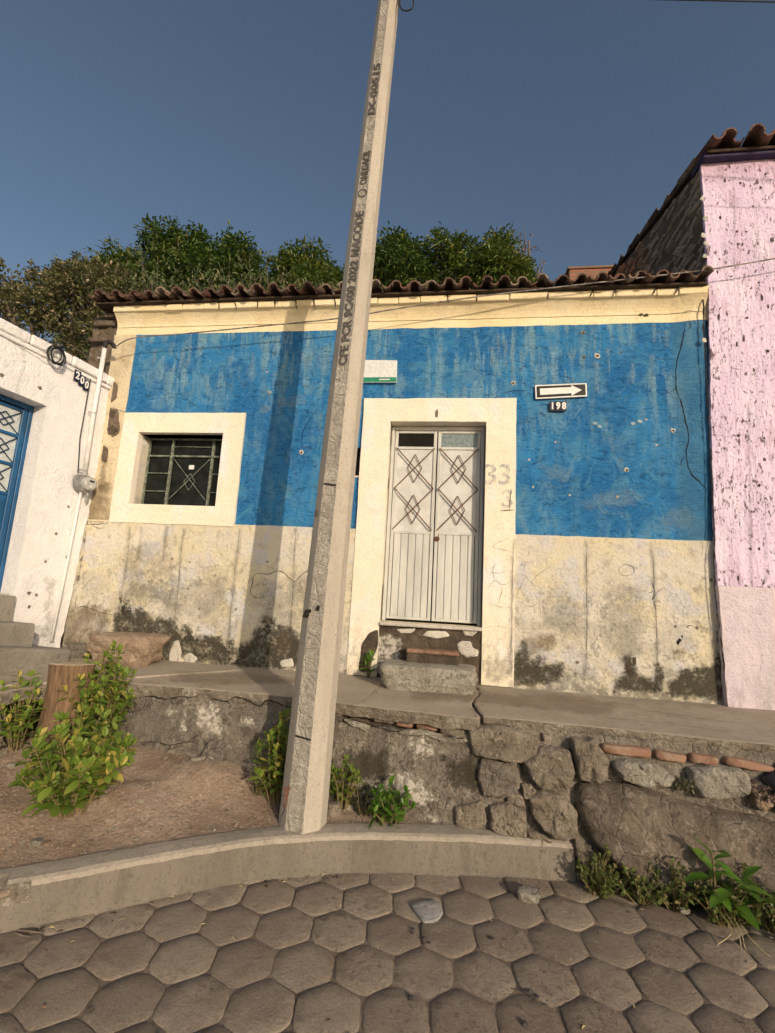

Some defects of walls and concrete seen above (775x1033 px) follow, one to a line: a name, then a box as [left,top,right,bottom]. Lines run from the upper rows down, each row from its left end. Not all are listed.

crack [671,299,725,677]
damp [113,598,299,669]
damp [511,639,563,685]
damp [613,631,723,702]
crack [348,685,430,735]